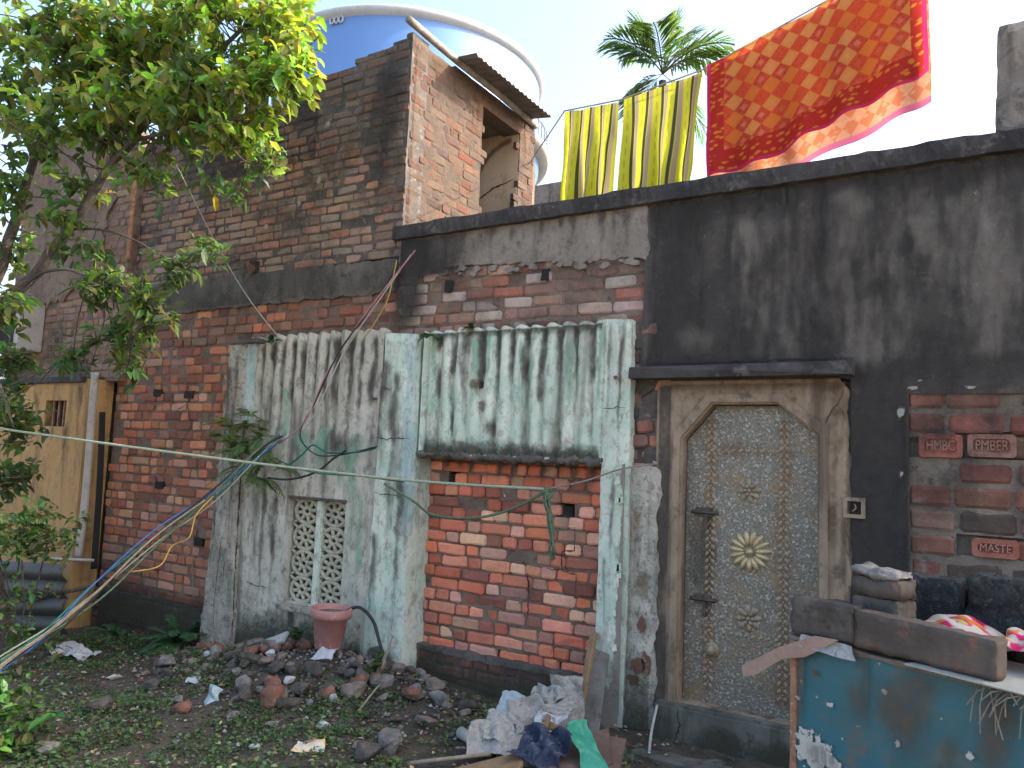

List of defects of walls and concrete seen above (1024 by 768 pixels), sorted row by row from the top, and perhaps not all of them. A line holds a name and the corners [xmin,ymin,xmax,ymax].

spalling [438,257,641,293]
damp [647,156,1024,367]
damp [262,337,399,445]
damp [432,326,624,418]
damp [423,422,599,483]
damp [810,324,1024,599]
damp [234,611,314,645]
damp [356,533,376,606]
damp [386,482,403,580]
peeling [600,464,652,729]